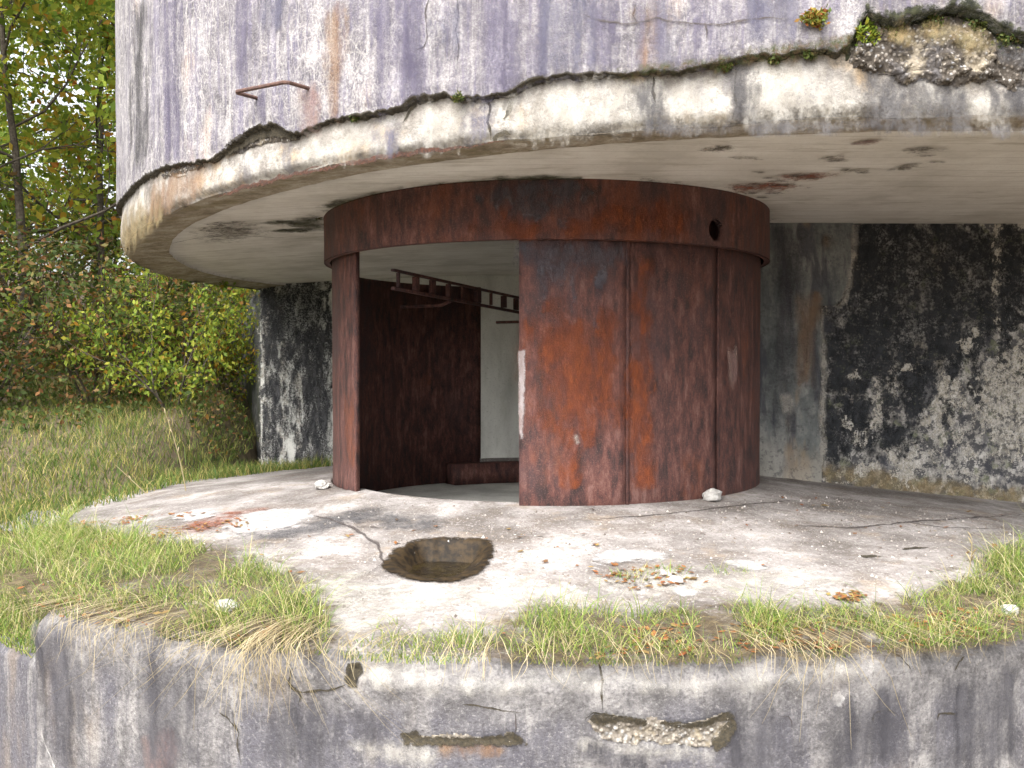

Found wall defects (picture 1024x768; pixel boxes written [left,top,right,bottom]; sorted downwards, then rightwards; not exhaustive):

water stain [235,0,247,64]
spalling [845,0,1024,92]
water stain [129,2,179,161]
corrosion [783,173,837,181]
water stain [252,281,333,467]
water stain [812,223,1024,469]
corrosion [176,512,237,531]
crack [314,515,384,572]
crack [592,499,1021,550]
spalling [400,730,528,752]
spalling [588,712,737,752]